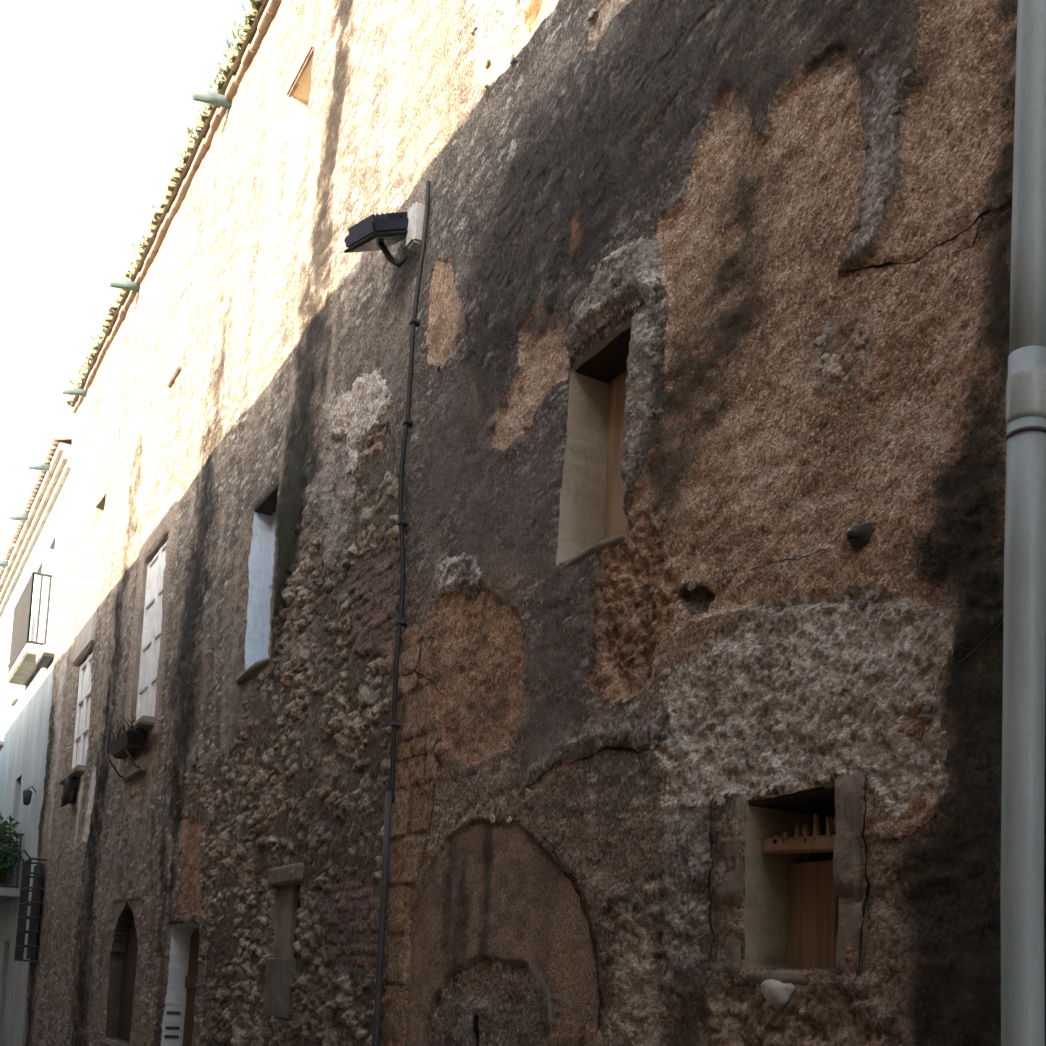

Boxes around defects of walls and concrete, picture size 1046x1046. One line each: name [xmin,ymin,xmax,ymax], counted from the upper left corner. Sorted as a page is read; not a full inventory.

flaking render [469,0,559,88]
water stain [209,295,231,397]
flaking render [426,256,466,371]
flaking render [471,299,571,451]
water stain [648,171,765,513]
flaking render [581,0,1017,843]
crack [838,198,1012,272]
water stain [71,436,142,1046]
water stain [152,411,221,958]
crack [518,724,664,797]
crack [688,794,716,970]
crack [852,777,879,987]